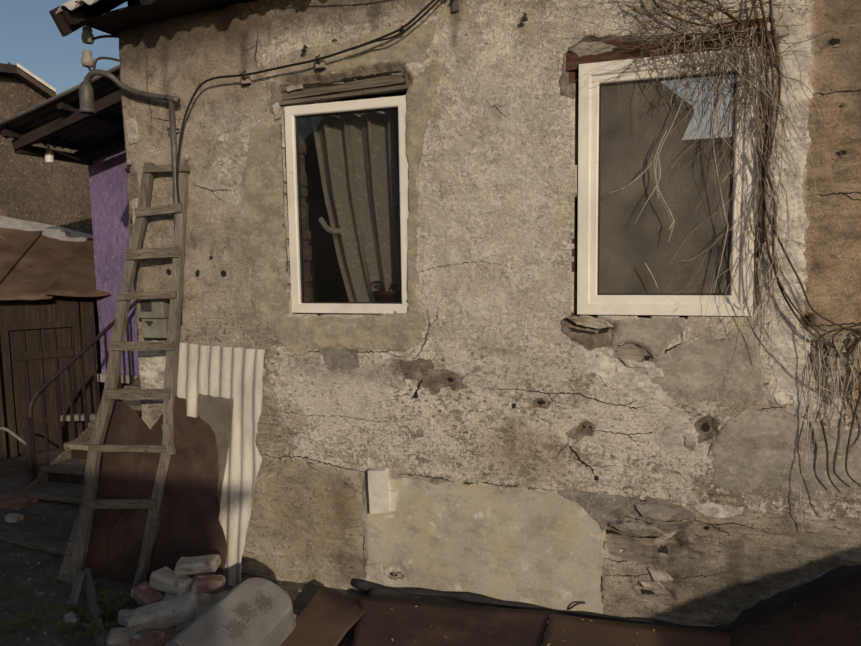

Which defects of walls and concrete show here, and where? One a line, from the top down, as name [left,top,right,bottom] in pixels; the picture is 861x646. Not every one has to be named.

spalling [558,33,678,99]
crack [812,191,861,200]
crack [355,309,439,399]
crack [273,410,411,429]
crack [483,388,647,409]
peeling [560,315,720,458]
crack [556,429,669,478]
crack [397,473,554,491]
spalling [606,495,744,607]